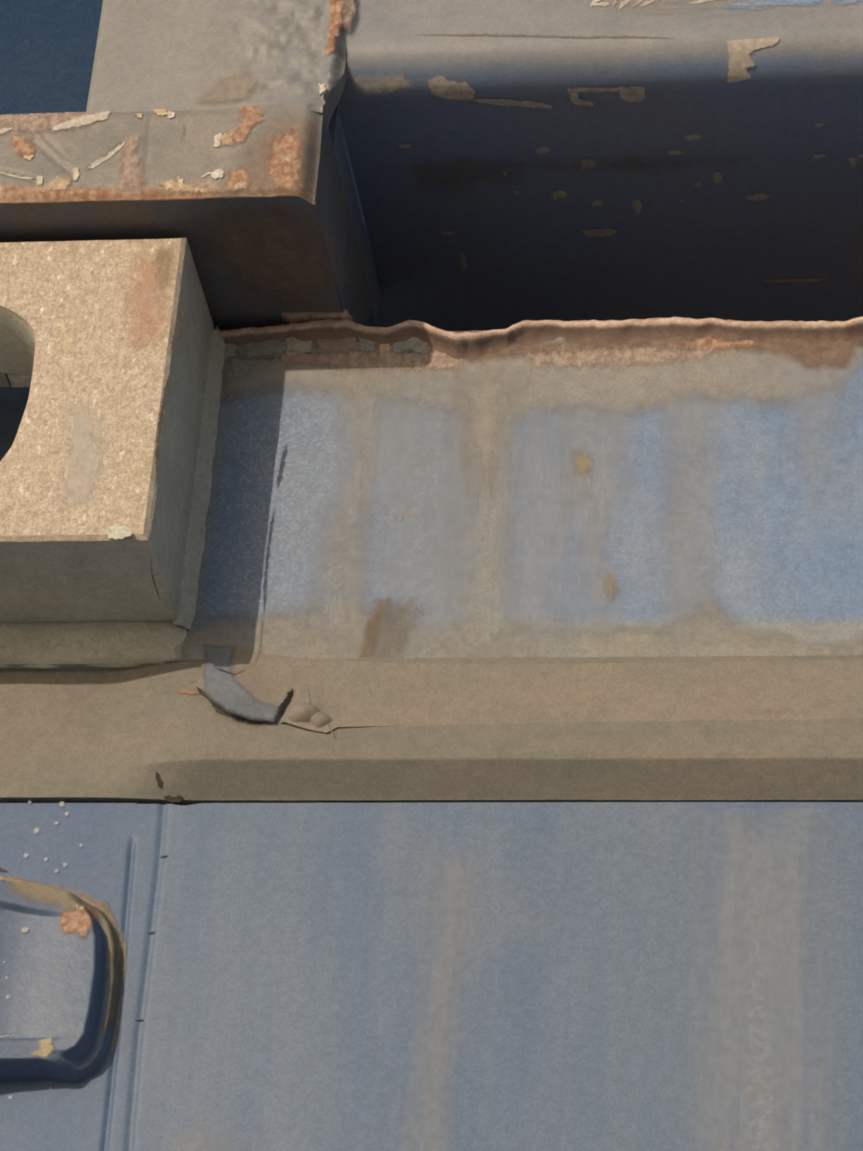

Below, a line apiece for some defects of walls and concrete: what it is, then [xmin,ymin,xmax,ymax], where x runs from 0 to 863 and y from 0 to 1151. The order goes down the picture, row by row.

rust [326,0,355,54]
peeling [727,36,779,83]
peeling [427,75,553,109]
peeling [567,86,647,106]
peeling [0,111,110,135]
peeling [135,109,175,119]
peeling [36,167,80,192]
peeling [158,169,224,194]
rust [282,337,852,372]
leakage [183,346,863,660]
peeling [204,645,278,720]